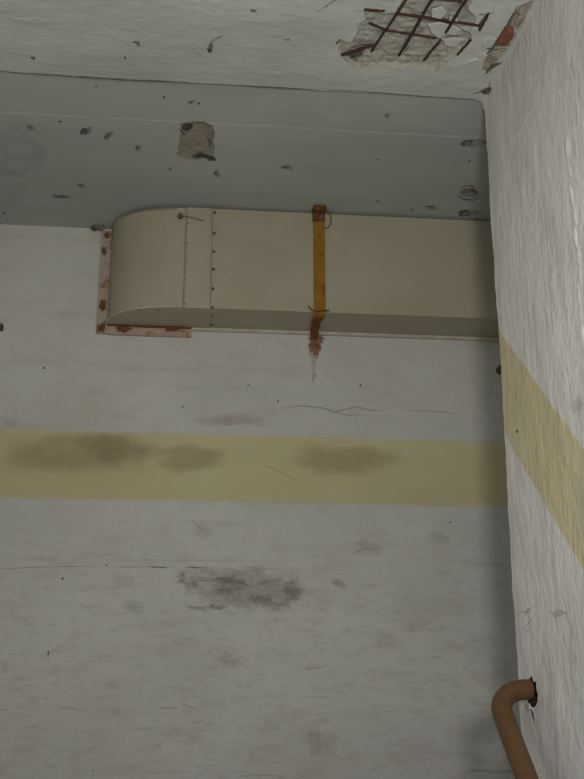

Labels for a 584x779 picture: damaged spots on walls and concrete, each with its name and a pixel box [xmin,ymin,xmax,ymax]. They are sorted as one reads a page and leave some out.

spalling [336,0,536,95]
peeling [177,121,216,161]
rust [309,335,324,358]
crack [285,405,455,416]